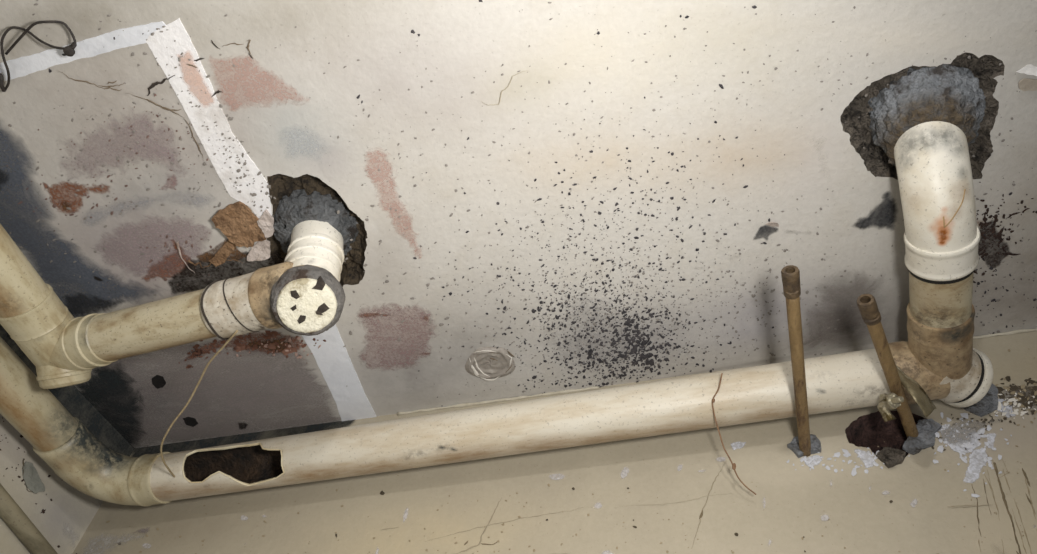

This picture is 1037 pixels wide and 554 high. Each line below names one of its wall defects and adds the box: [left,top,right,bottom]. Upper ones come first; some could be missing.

spalling [840,52,1037,180]
corrosion [44,182,108,213]
water stain [0,124,156,317]
spalling [176,174,368,287]
water stain [408,82,797,394]
water stain [855,192,904,229]
mould [973,168,1037,334]
corrosion [179,330,326,369]
spalling [786,411,927,485]
peeling [925,376,1037,484]